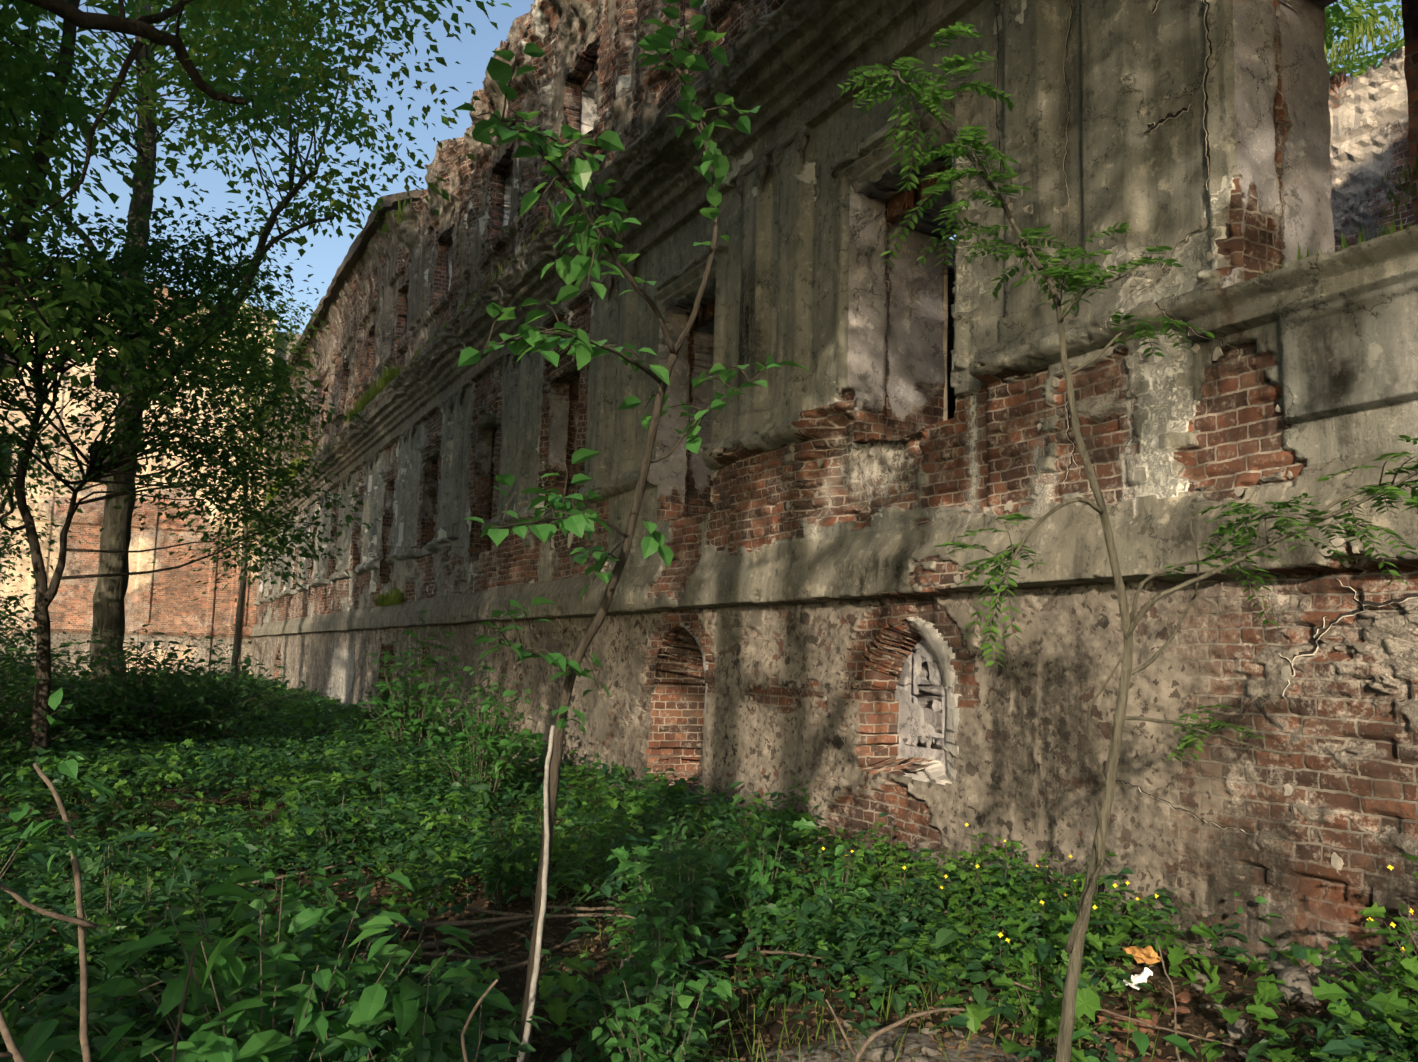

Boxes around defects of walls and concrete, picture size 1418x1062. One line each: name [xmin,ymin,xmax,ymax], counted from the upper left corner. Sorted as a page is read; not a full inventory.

crack [1058,0,1073,206]
crack [1144,0,1212,190]
flaking render [919,171,1307,521]
crack [1105,230,1241,361]
flaking render [644,427,828,604]
flaking render [902,554,981,597]
crack [1279,579,1418,699]
flaking render [1269,583,1418,1003]